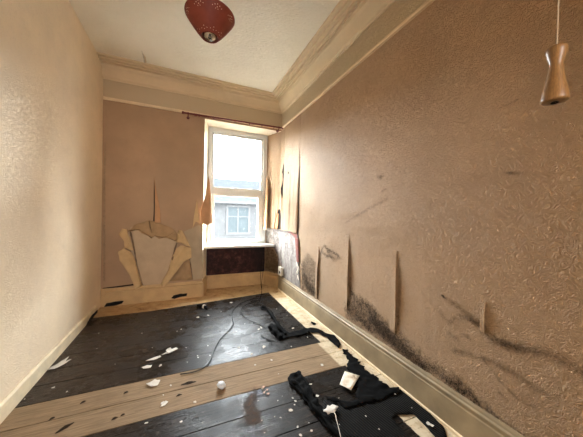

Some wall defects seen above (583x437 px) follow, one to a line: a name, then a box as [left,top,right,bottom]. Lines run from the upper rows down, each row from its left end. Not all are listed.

flaking render [128,227,178,285]
flaking render [184,202,203,280]
flaking render [266,228,300,288]
damp [301,256,316,296]
damp [345,285,497,418]